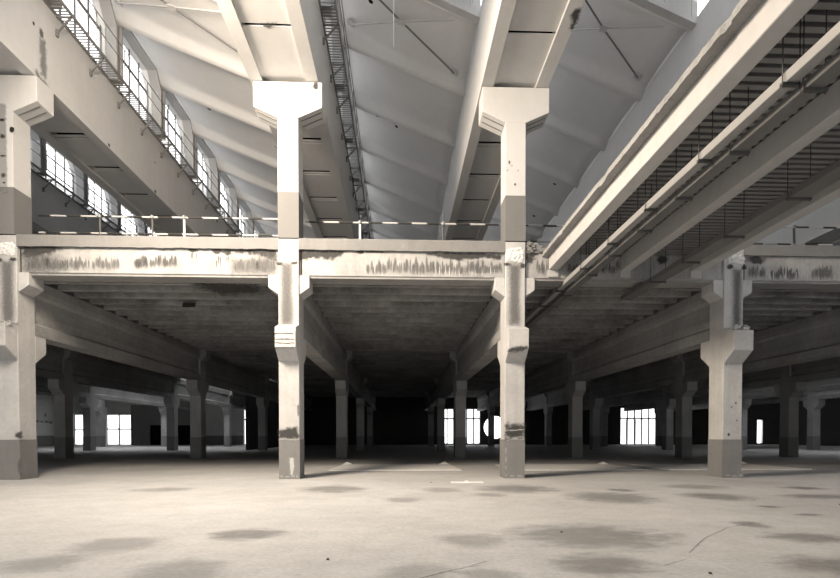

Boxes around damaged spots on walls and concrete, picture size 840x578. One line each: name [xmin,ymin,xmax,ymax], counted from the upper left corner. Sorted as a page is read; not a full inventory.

leakage [22,247,119,271]
leakage [134,255,177,267]
leakage [212,249,277,273]
leakage [299,250,347,275]
leakage [357,251,501,276]
spalling [728,254,745,264]
leakage [748,256,836,280]
leakage [196,283,261,295]